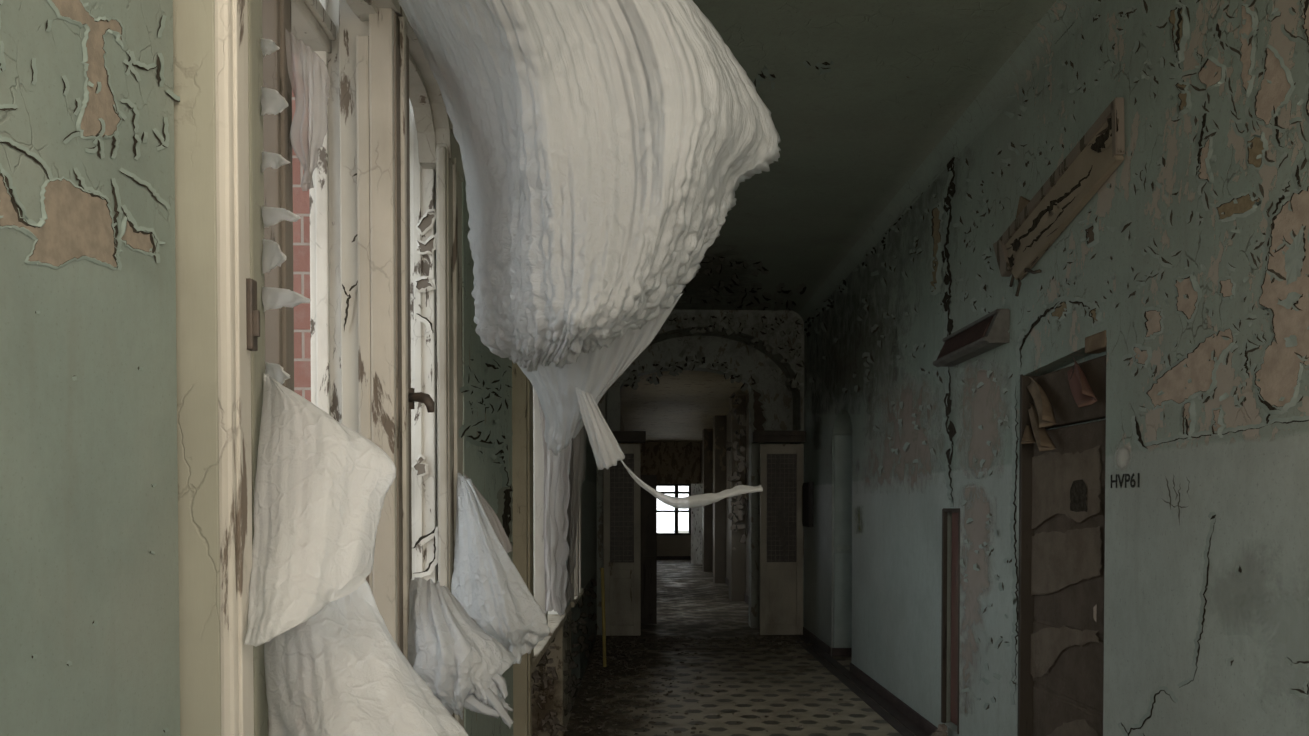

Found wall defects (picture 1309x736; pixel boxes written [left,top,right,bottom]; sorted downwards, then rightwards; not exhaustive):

peeling [141,117,170,150]
peeling [1118,0,1309,439]
crack [941,157,957,507]
peeling [623,349,768,550]
crack [1118,512,1242,736]
crack [1285,657,1309,698]